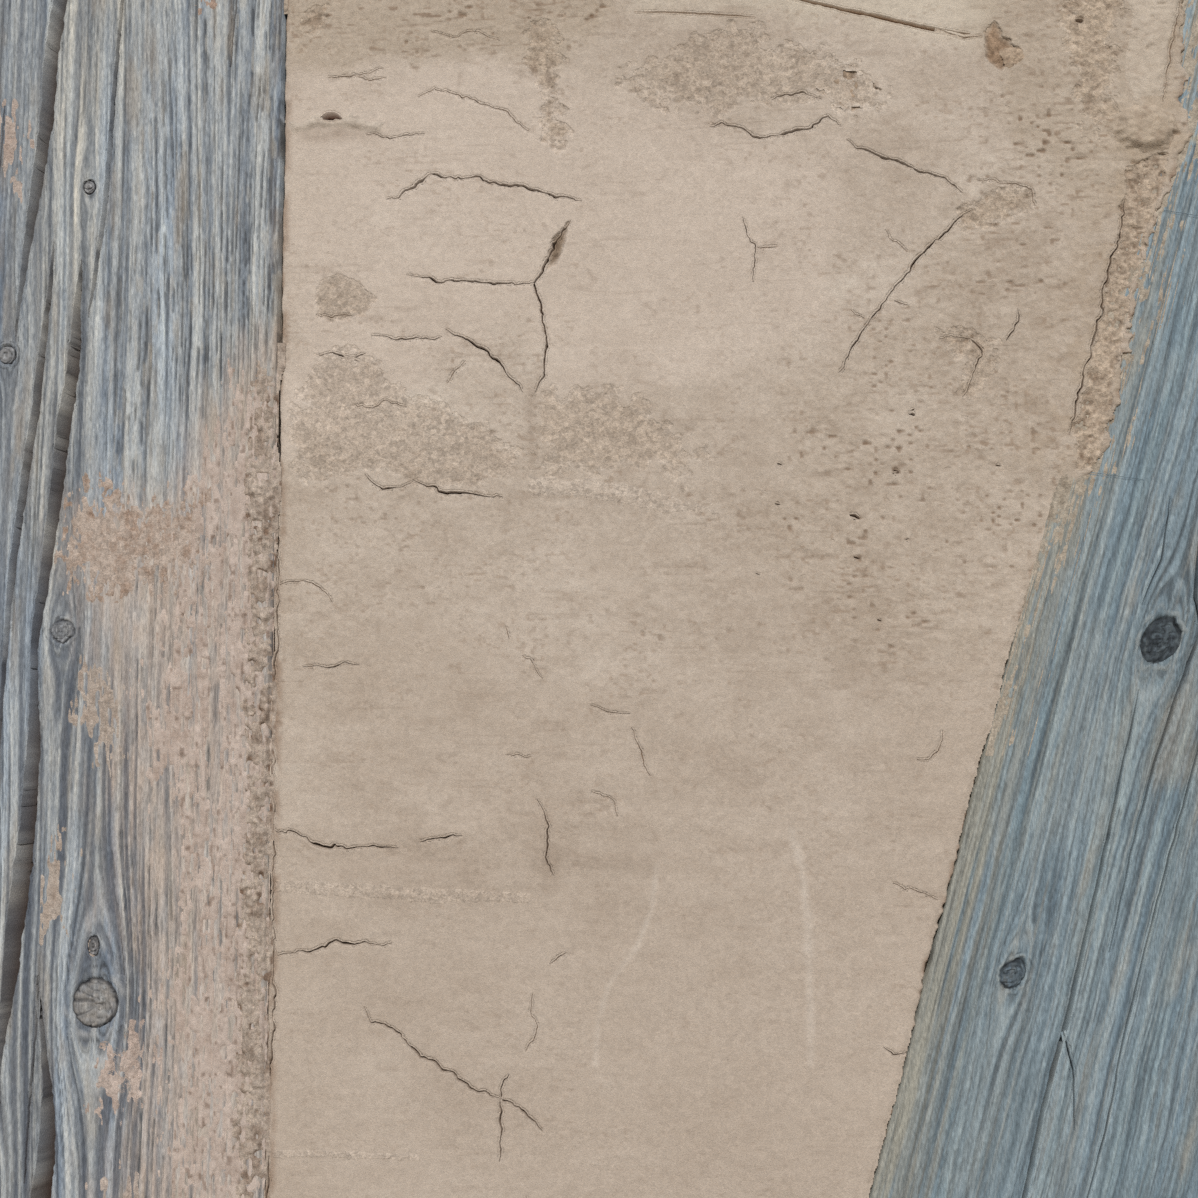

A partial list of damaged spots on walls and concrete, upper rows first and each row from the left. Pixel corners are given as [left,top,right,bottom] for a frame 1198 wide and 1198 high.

crack [366,132,425,141]
crack [418,87,530,132]
spalling [983,21,1024,71]
spalling [1058,0,1131,144]
crack [316,172,582,393]
crack [709,90,1037,373]
spalling [934,326,1002,419]
spalling [955,185,1037,233]
spalling [1069,153,1168,471]
crack [265,515,462,1198]
crack [549,952,567,965]
crack [363,993,543,1162]